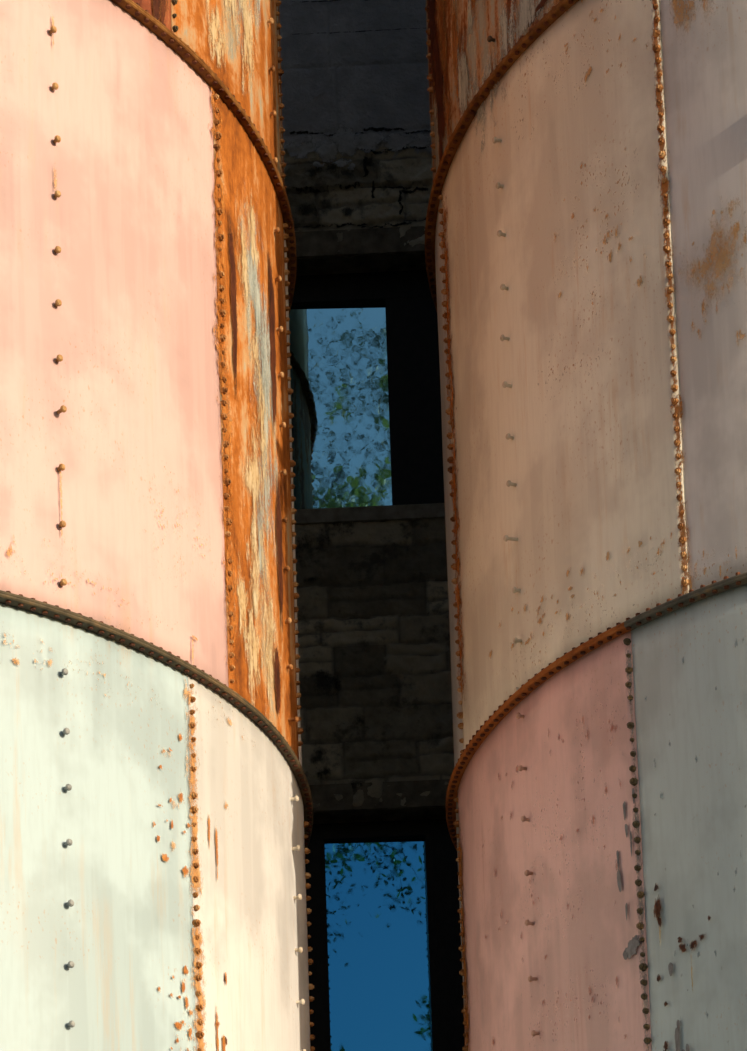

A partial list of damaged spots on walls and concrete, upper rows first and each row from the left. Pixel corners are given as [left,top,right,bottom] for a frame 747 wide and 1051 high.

corrosion [153,0,168,24]
crack [290,127,431,228]
corrosion [211,86,238,681]
corrosion [268,251,277,434]
corrosion [441,204,464,692]
corrosion [627,0,737,607]
corrosion [272,474,284,714]
corrosion [639,883,662,1017]
corrosion [678,934,704,952]